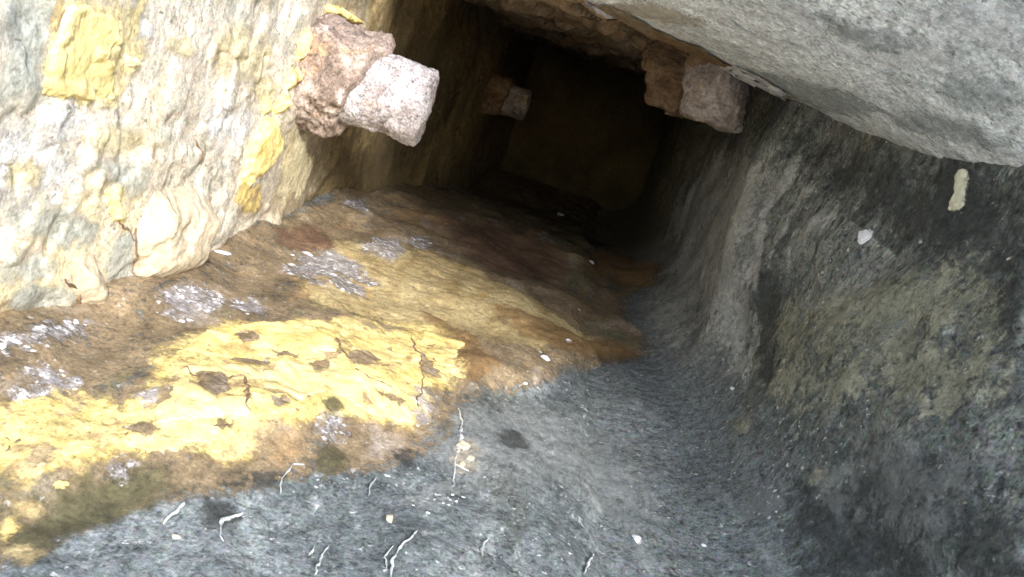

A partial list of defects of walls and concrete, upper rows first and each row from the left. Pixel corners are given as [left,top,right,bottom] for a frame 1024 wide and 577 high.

damp [276,235,432,301]
damp [157,283,266,323]